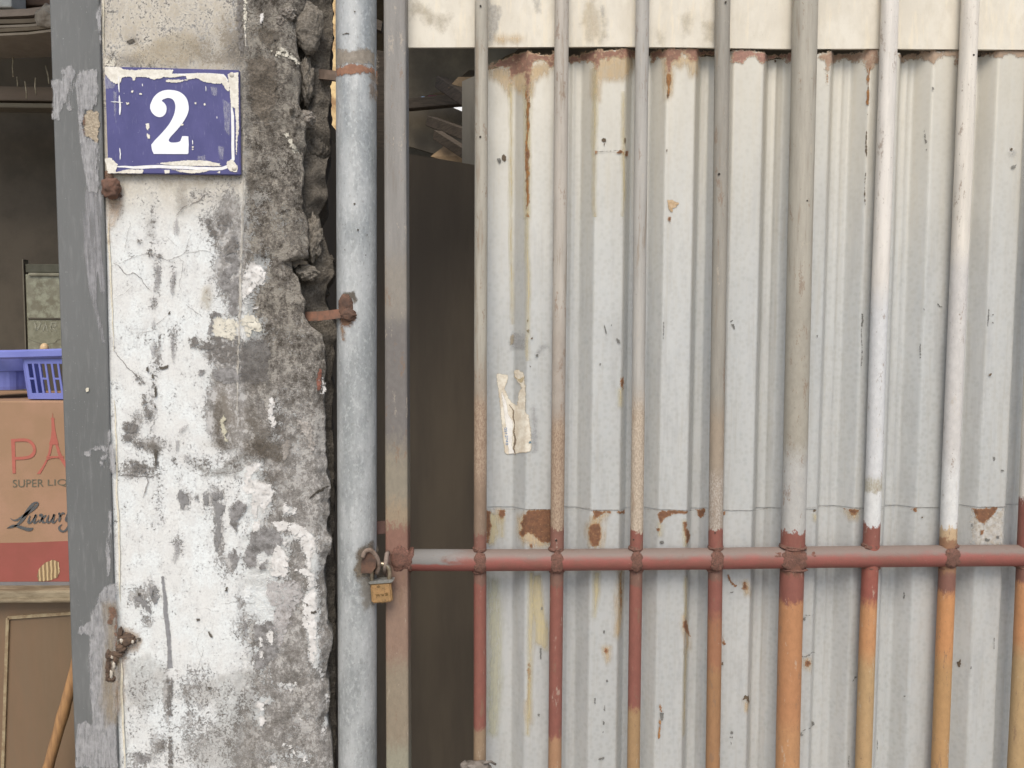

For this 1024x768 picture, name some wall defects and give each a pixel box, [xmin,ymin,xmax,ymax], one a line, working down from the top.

corrosion [650,48,714,98]
corrosion [818,49,879,105]
corrosion [978,50,1024,58]
corrosion [488,50,554,217]
flaking render [316,369,327,394]
spalling [268,397,276,429]
corrosion [519,509,551,548]
corrosion [657,508,706,544]
peeling [176,461,330,705]
peeling [133,576,173,716]
peeling [256,697,271,726]
peeling [134,751,151,765]